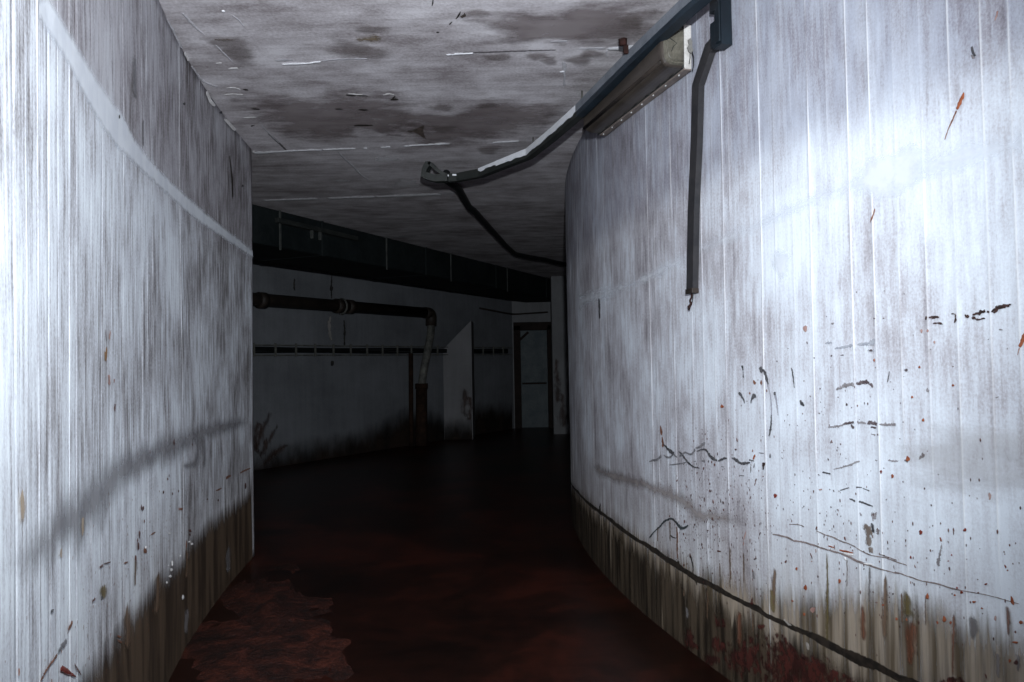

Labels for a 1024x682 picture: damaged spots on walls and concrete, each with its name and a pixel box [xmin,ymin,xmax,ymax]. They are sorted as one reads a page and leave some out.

damp [250,94,551,143]
damp [493,5,655,43]
damp [83,492,252,682]
crack [571,484,918,682]
damp [571,487,1024,682]